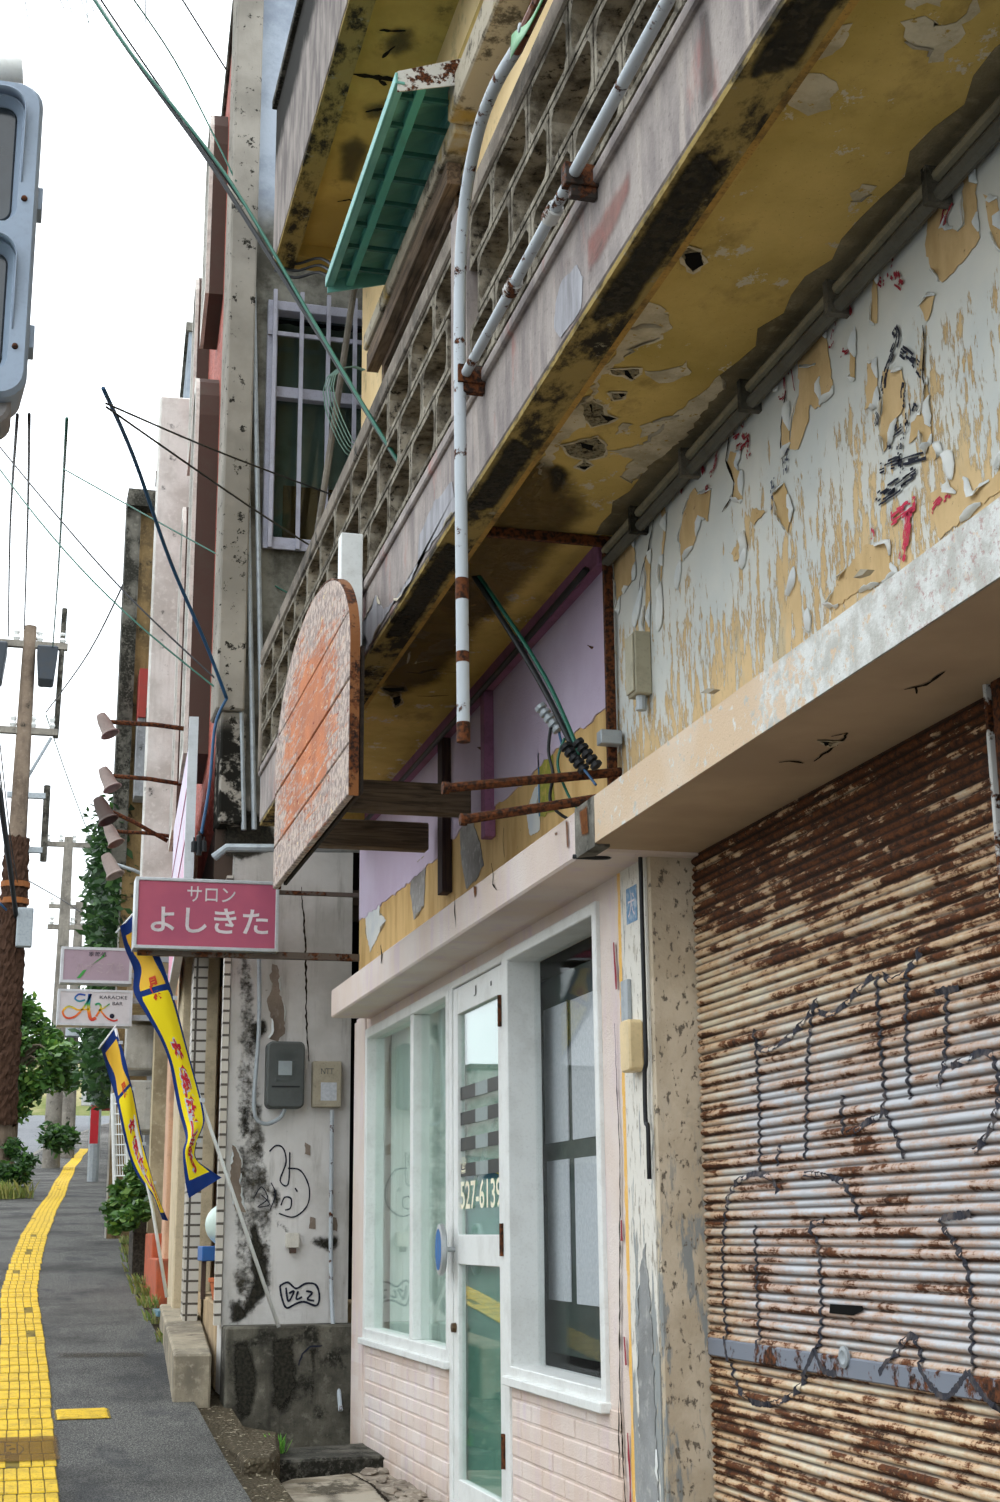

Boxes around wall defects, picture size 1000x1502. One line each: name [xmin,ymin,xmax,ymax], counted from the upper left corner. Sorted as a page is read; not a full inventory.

water stain [751,0,841,78]
peeling [788,23,853,116]
peeling [901,0,980,63]
water stain [342,138,365,180]
water stain [592,153,721,321]
peeling [536,44,1000,539]
water stain [384,439,582,695]
peeling [612,488,711,632]
peeling [803,539,898,632]
peeling [365,905,386,951]
water stain [230,959,280,1322]
water stain [233,1338,316,1416]